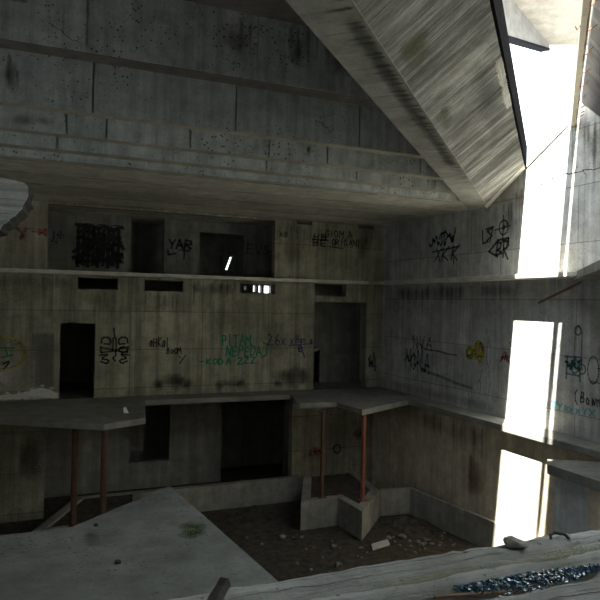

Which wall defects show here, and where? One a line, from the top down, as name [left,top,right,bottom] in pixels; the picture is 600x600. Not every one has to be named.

crack [540,168,598,185]
peeling [0,384,59,400]